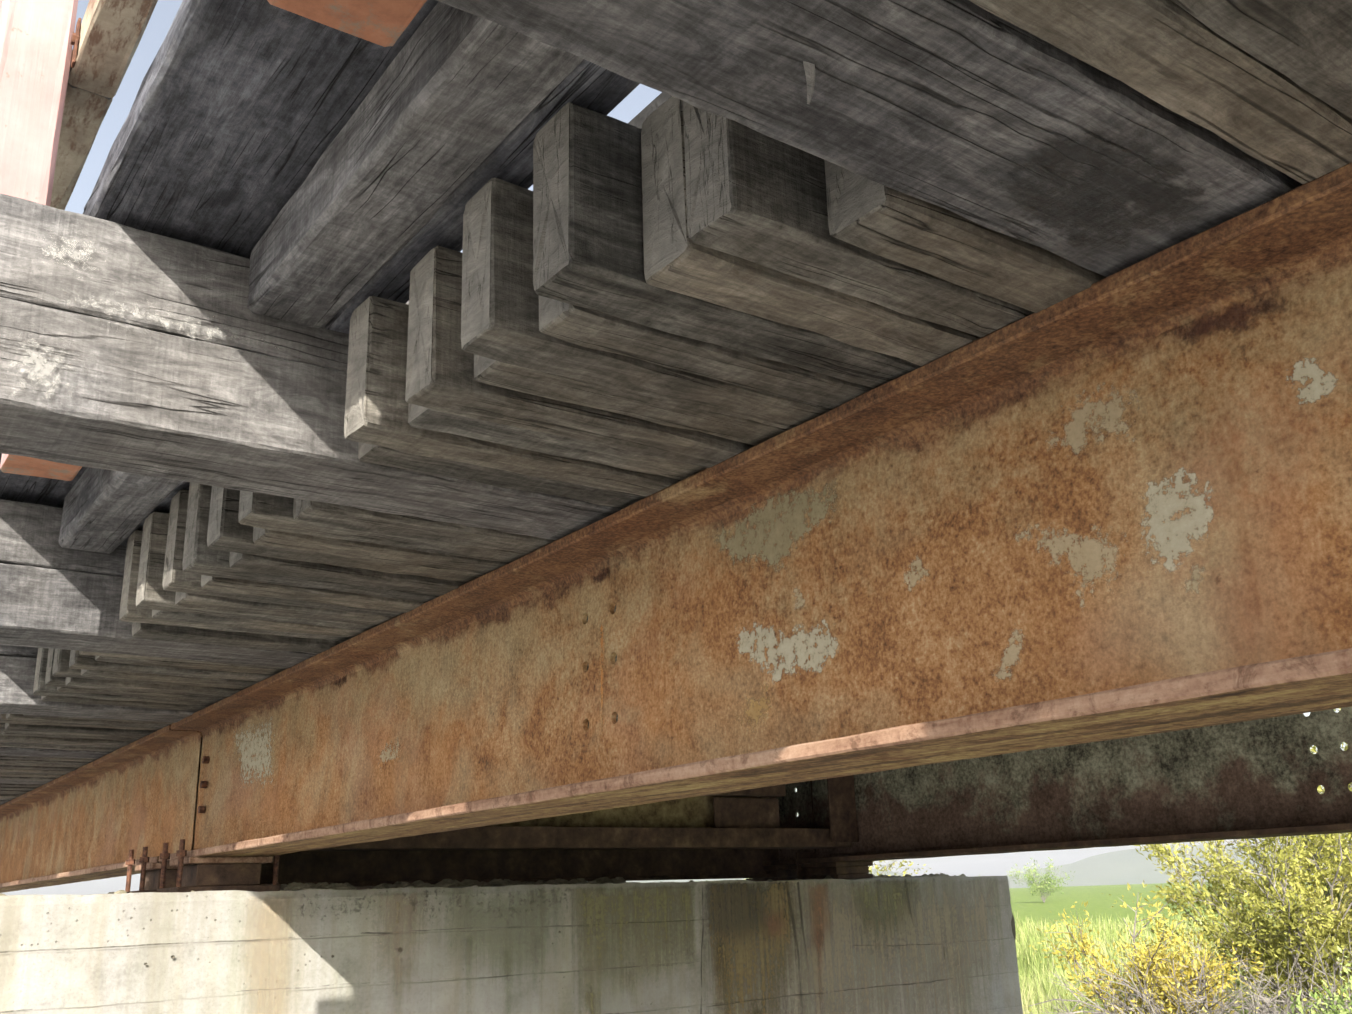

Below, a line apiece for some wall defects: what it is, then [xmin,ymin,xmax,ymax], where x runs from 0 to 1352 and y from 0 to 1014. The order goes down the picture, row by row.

rust [1165,299,1284,341]
peeling [1048,383,1137,454]
peeling [1286,357,1338,404]
peeling [717,485,837,571]
peeling [1016,467,1213,606]
peeling [735,619,839,732]